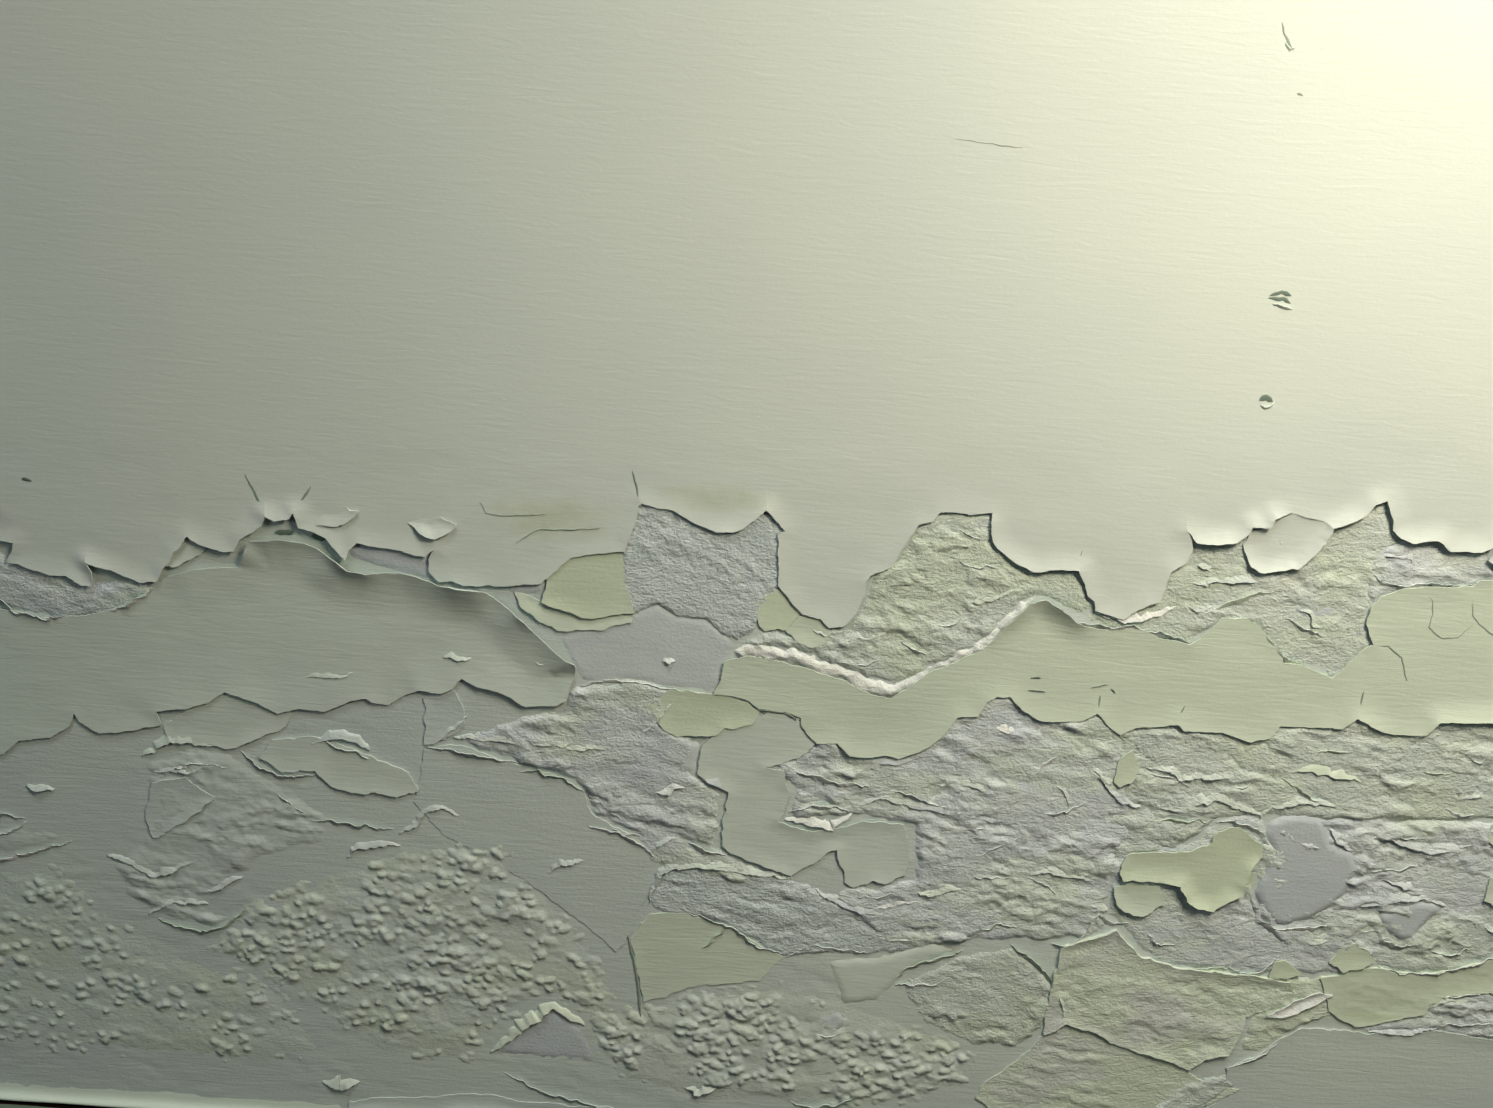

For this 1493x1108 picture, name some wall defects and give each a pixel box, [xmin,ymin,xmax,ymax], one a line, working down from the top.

peeling [1268,290,1293,310]
peeling [1259,394,1274,409]
crack [1428,597,1493,639]
crack [1386,646,1407,680]
peeling [0,439,1493,1108]